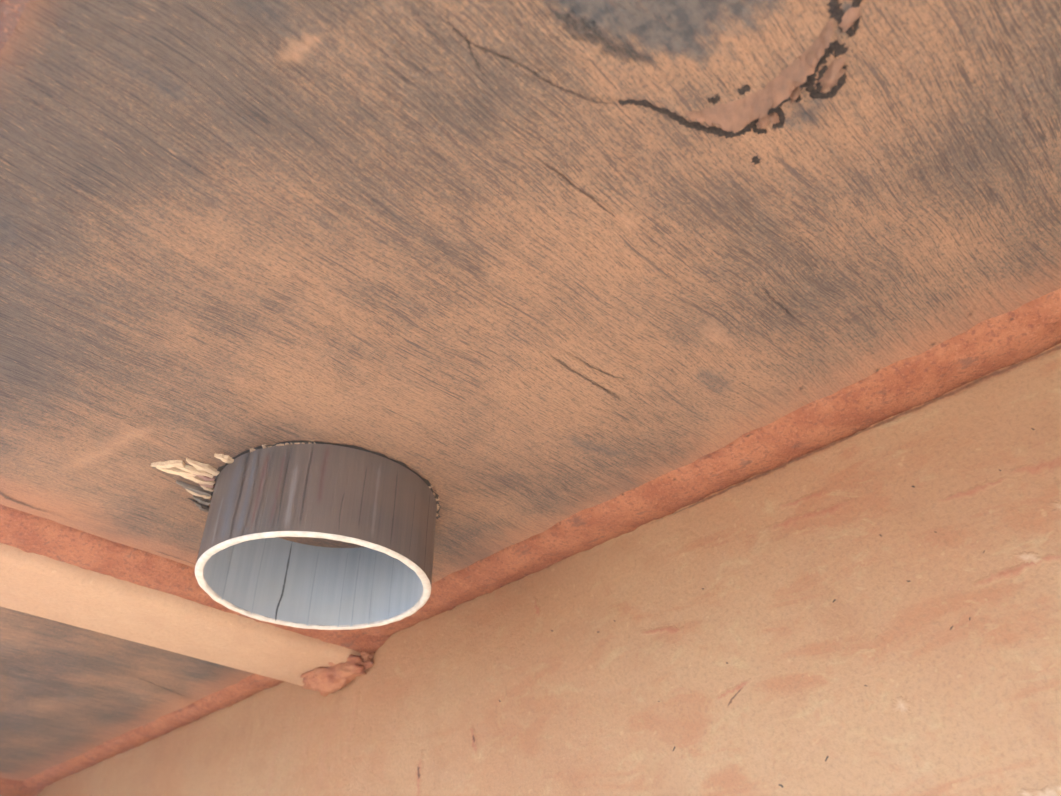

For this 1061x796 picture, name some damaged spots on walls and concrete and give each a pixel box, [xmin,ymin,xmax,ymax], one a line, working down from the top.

peeling [838,6,862,32]
damp [524,0,795,74]
peeling [817,57,846,92]